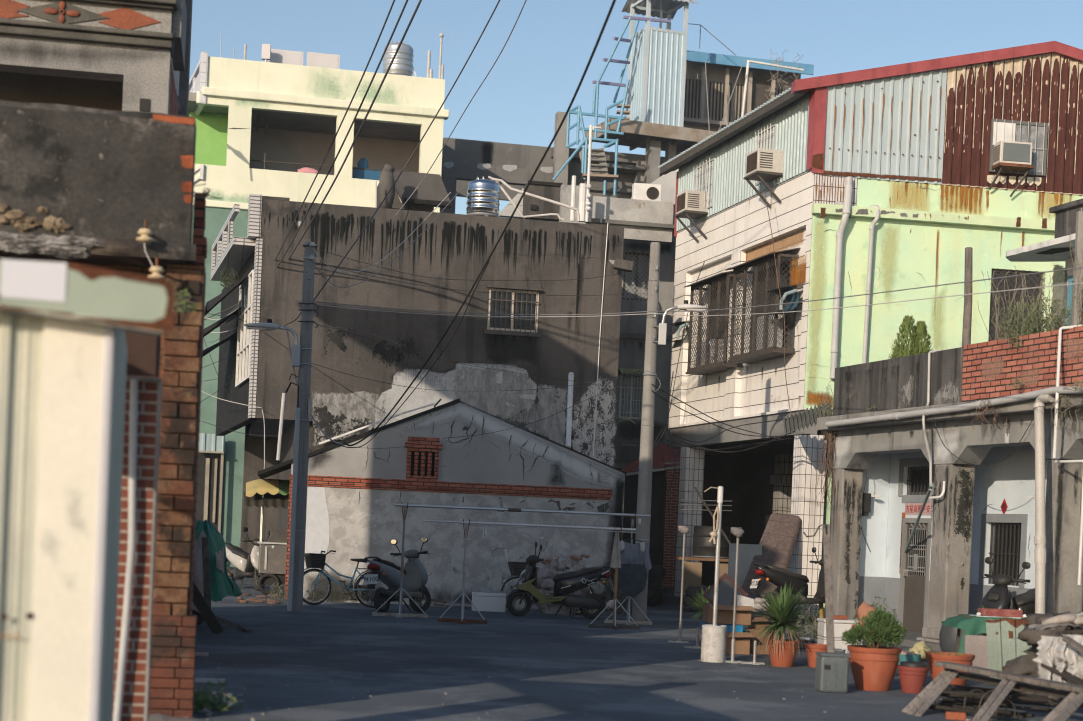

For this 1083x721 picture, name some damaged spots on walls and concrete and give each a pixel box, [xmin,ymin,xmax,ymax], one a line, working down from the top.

corrosion [812,53,1083,215]
leakage [264,205,592,320]
crack [359,414,549,502]
peeling [310,362,617,466]
leakage [832,479,862,619]
leakage [931,467,975,542]